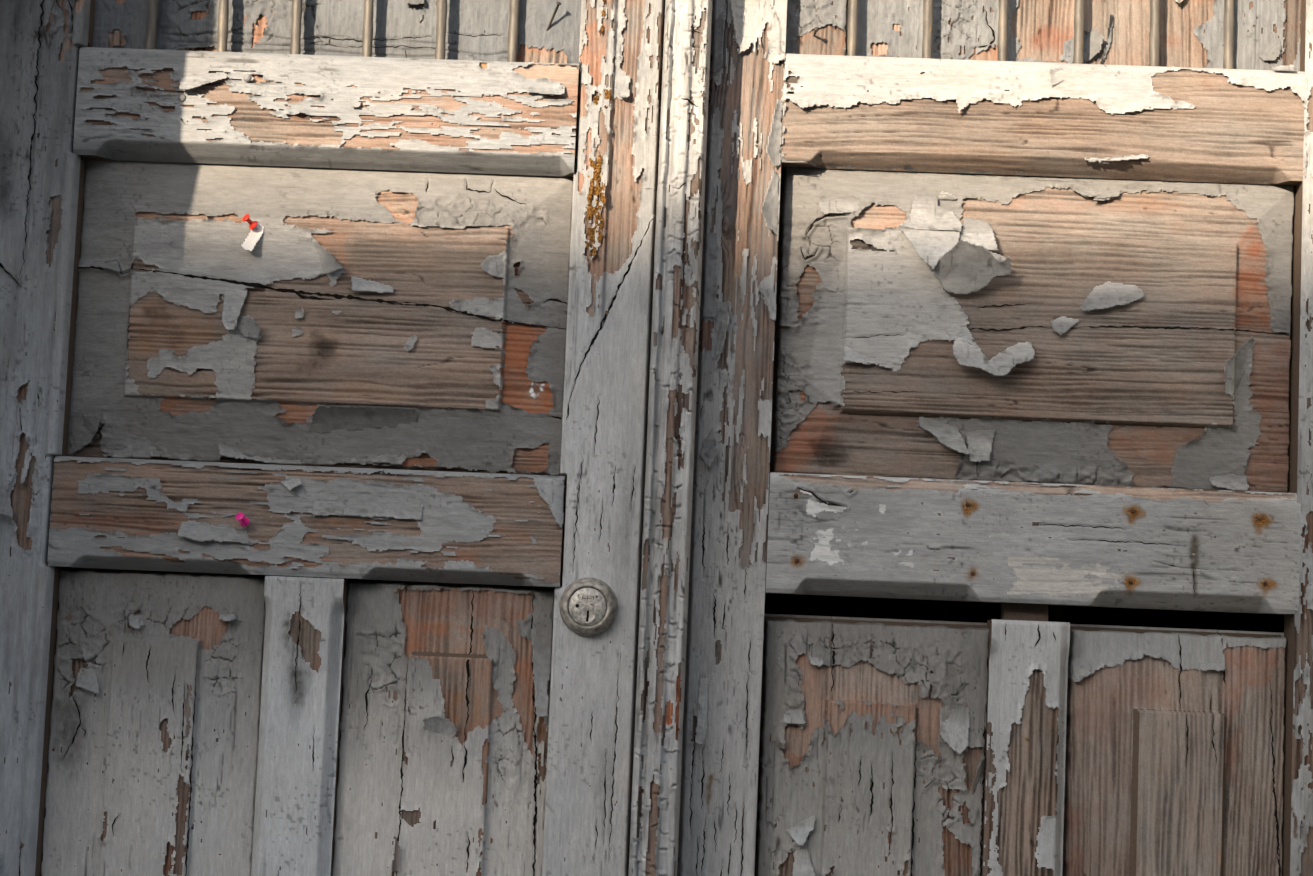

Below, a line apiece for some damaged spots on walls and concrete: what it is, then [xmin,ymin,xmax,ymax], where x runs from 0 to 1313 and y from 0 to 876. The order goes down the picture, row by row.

peeling [1304,72,1313,177]
peeling [1305,0,1313,86]
peeling [78,185,560,434]
peeling [778,261,839,336]
corrosion [1253,514,1268,531]
peeling [1290,133,1313,876]
peeling [41,580,337,876]
peeling [332,583,553,876]
peeling [684,678,708,750]
peeling [756,620,1287,876]